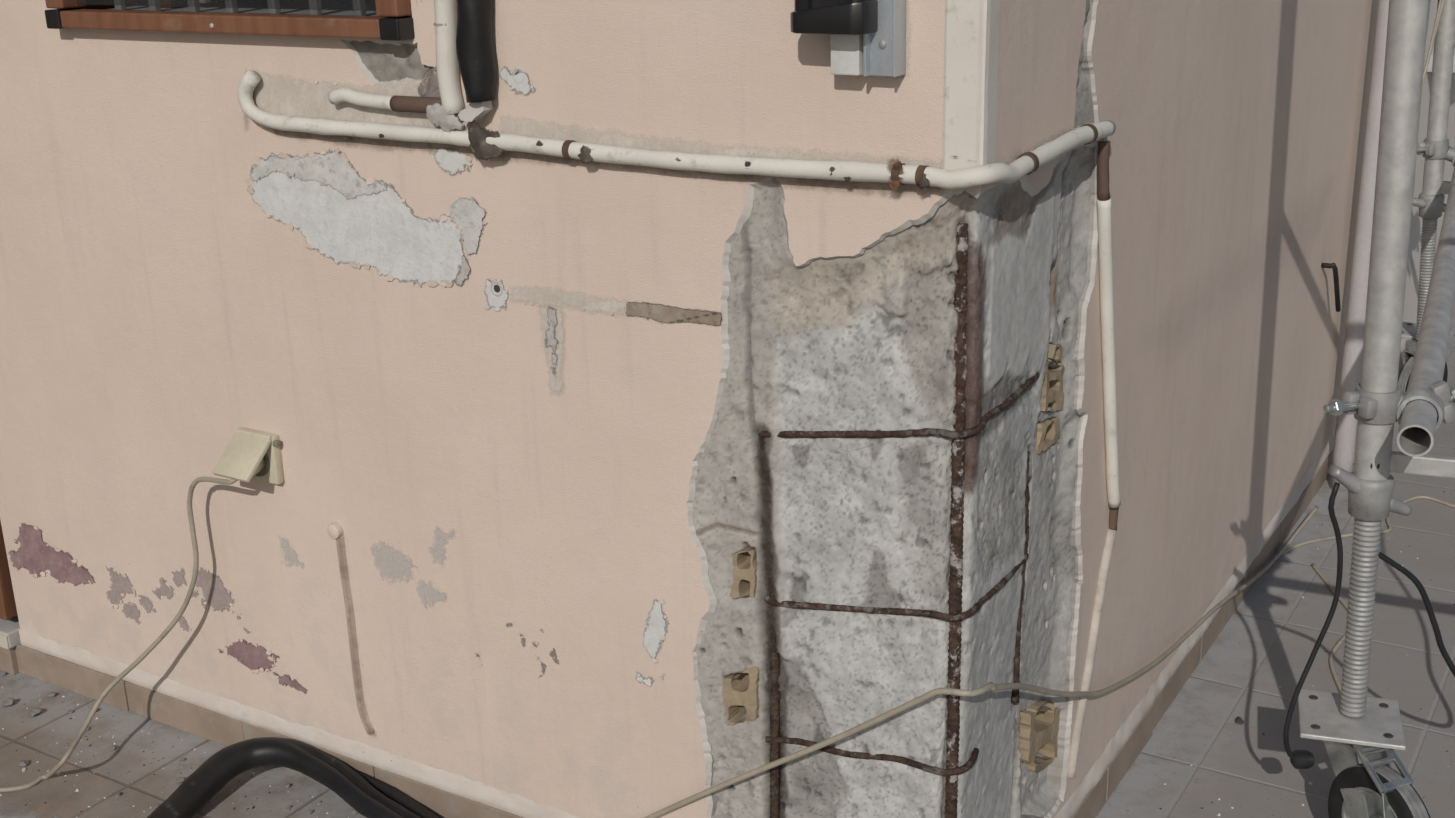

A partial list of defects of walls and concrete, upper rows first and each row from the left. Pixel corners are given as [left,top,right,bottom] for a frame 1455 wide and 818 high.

crack [1074,0,1099,129]
peeling [245,147,487,287]
spalling [686,89,1110,818]
rust [956,246,985,491]
peeling [7,522,307,694]
rust [758,436,783,818]